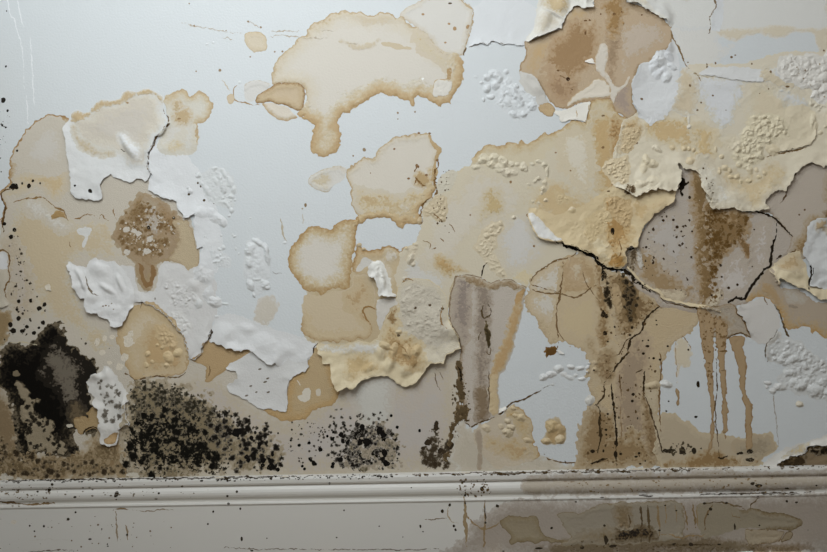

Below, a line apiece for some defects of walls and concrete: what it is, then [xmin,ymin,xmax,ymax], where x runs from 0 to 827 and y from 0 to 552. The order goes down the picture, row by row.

leakage [157,89,214,156]
leakage [0,179,406,493]
leakage [222,0,474,157]
peeling [0,114,699,480]
leakage [288,98,626,348]
crack [451,375,545,428]
crack [531,242,697,465]
leakage [600,247,661,383]
peeling [468,0,827,338]
leakage [646,0,827,117]
crack [714,173,796,459]
leakage [745,268,827,339]